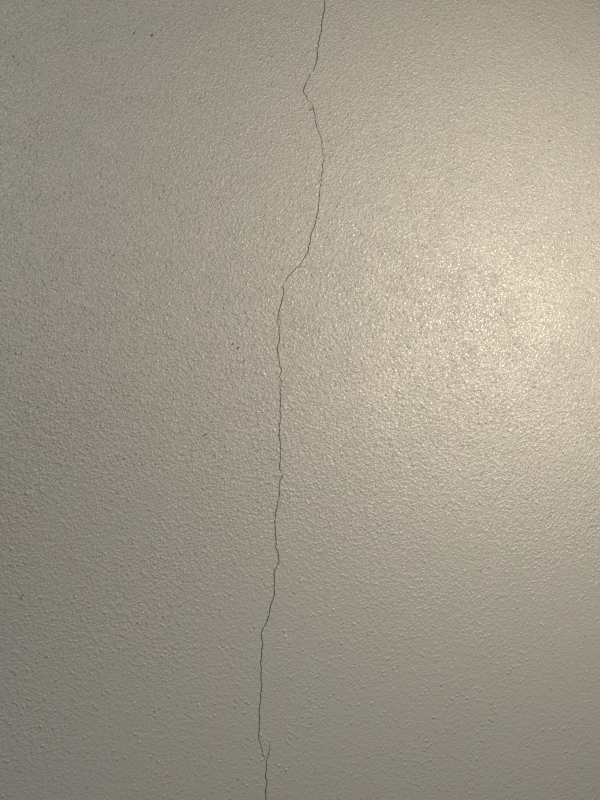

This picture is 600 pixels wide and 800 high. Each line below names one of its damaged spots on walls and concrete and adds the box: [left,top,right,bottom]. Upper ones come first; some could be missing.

crack [258,0,325,798]